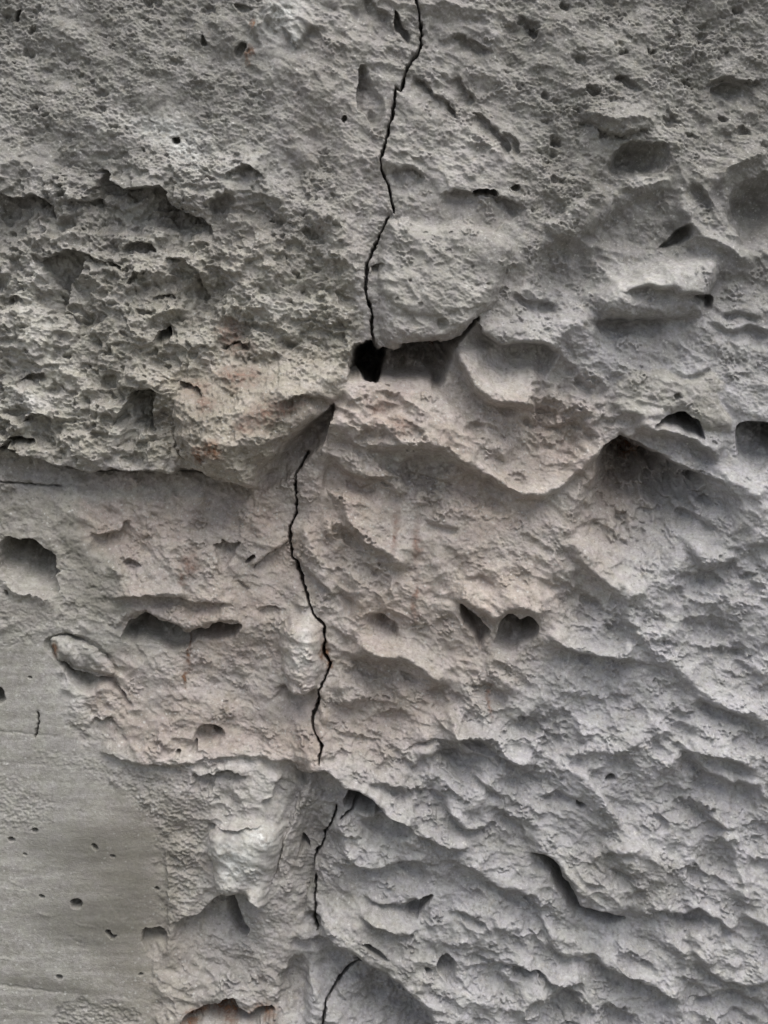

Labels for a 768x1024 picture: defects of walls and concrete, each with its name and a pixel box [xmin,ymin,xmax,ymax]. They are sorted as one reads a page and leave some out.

crack [364,0,424,348]
crack [254,451,332,768]
crack [313,791,360,931]
crack [321,958,362,1024]